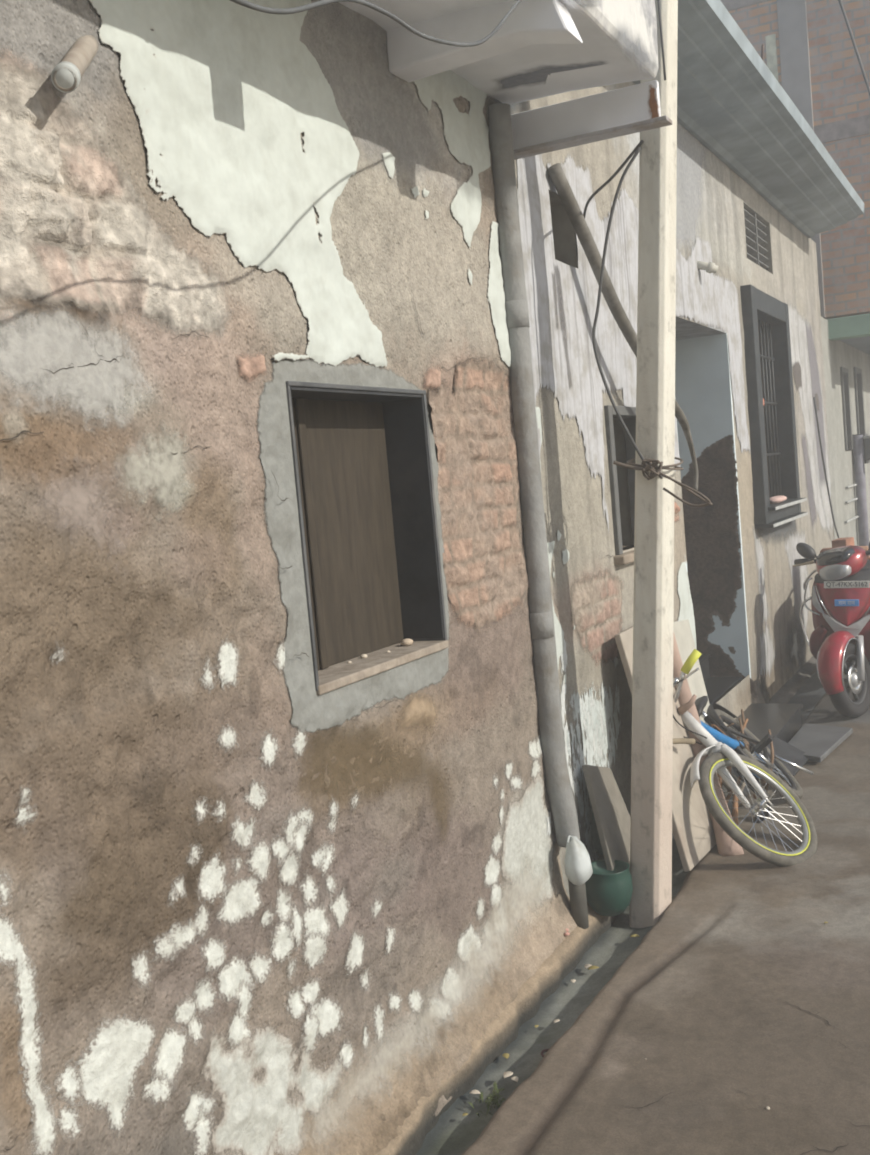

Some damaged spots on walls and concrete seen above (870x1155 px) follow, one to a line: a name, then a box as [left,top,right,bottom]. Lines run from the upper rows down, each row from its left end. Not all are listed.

flaking render [0,51,229,335]
peeling [90,0,388,379]
peeling [383,152,395,179]
flaking render [411,70,529,632]
peeling [517,154,639,531]
leakage [307,732,421,787]